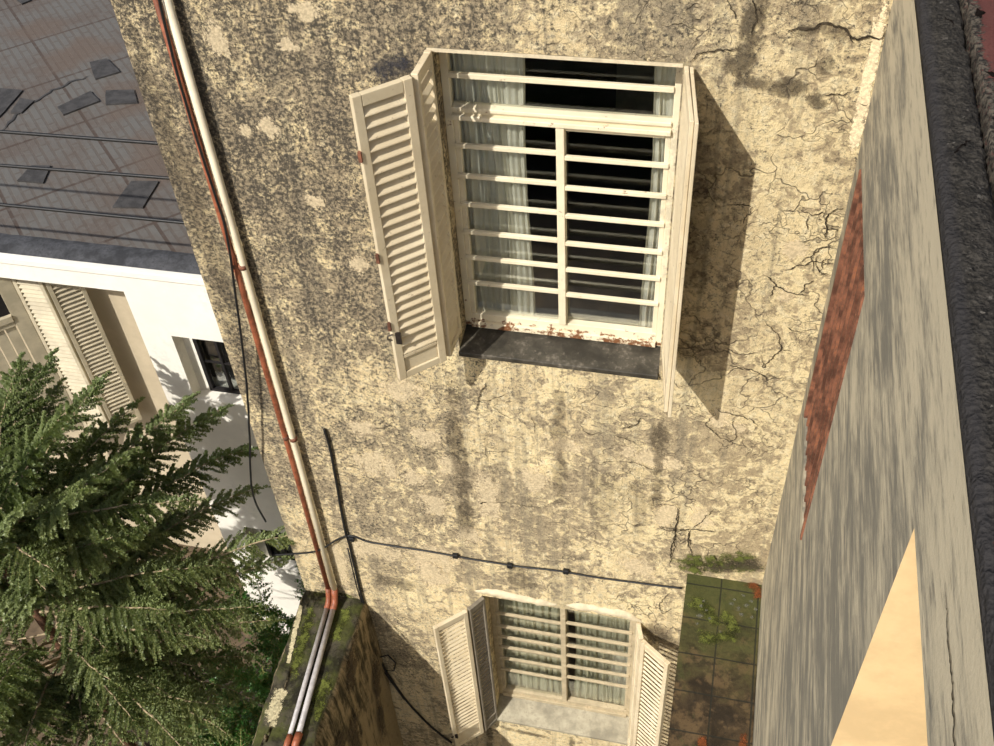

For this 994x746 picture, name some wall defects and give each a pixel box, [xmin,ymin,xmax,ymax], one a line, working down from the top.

crack [690,0,762,62]
crack [789,22,888,43]
crack [767,208,844,296]
crack [725,324,799,381]
crack [658,504,713,566]